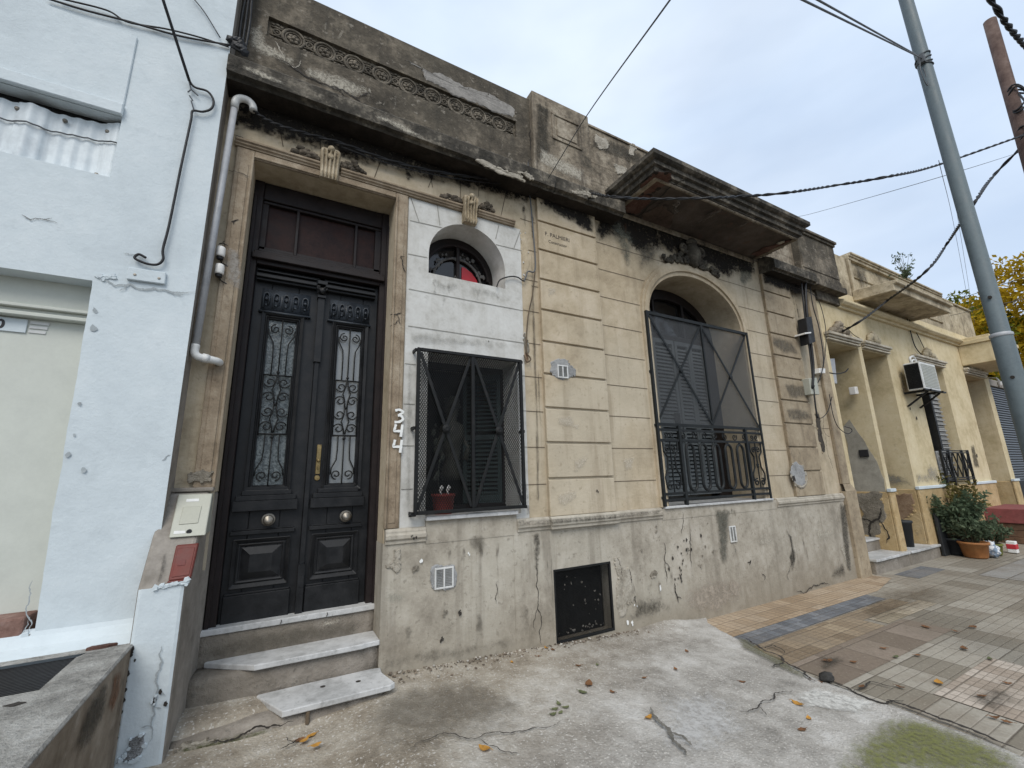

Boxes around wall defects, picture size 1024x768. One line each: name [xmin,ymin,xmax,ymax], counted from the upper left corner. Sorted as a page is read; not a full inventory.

flaking render [475,159,534,183]
crack [99,278,188,295]
water stain [716,511,728,560]
crack [862,508,890,540]
crack [748,531,828,594]
crack [23,580,33,632]
crack [533,566,542,645]
crack [142,647,165,744]
peeling [116,732,147,764]